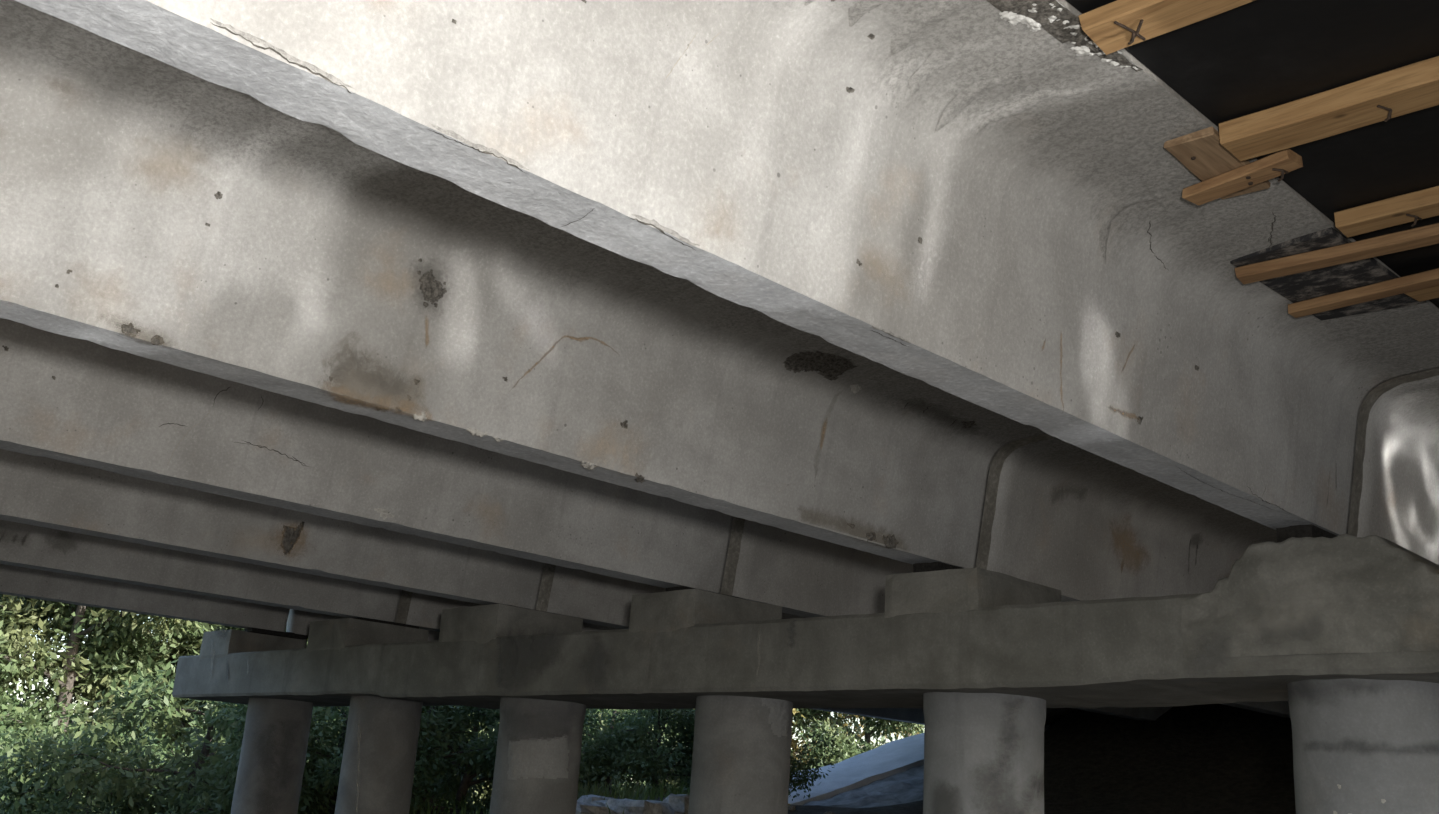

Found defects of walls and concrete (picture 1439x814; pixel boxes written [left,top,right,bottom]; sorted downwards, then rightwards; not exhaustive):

peeling [986,0,1143,72]
spalling [417,258,447,308]
spalling [783,351,861,393]
spalling [280,521,305,555]